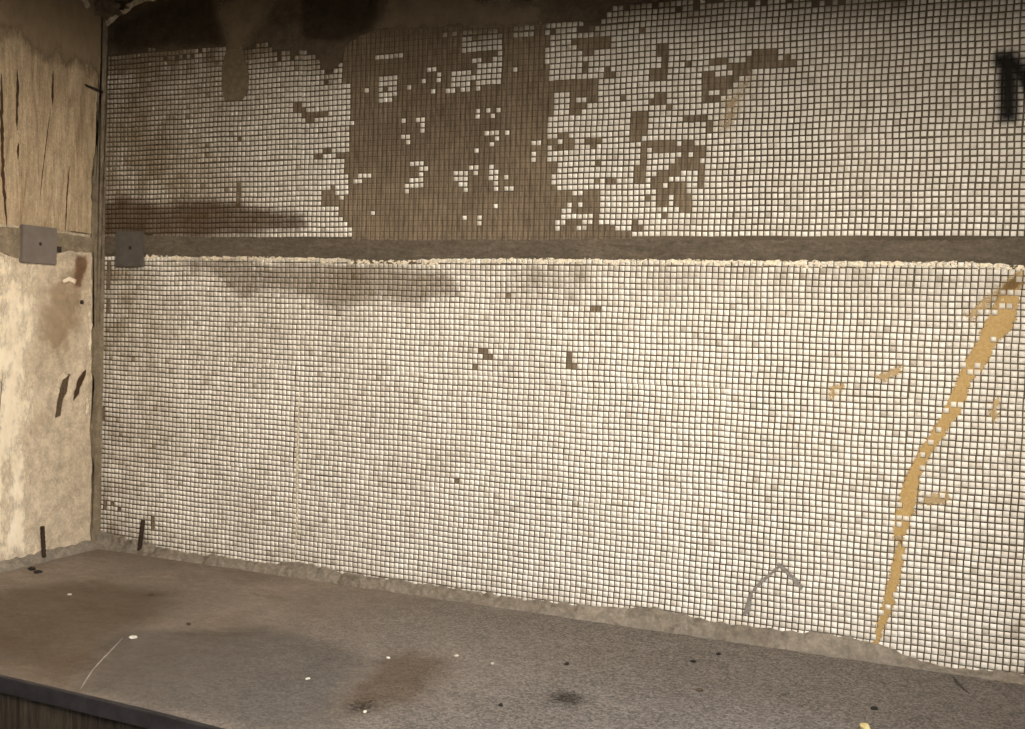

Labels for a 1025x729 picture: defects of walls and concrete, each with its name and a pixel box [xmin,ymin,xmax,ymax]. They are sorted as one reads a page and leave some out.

spalling [82,0,155,26]
crack [0,70,19,226]
crack [40,73,54,196]
damp [105,200,303,236]
peeling [314,25,644,240]
peeling [620,44,796,219]